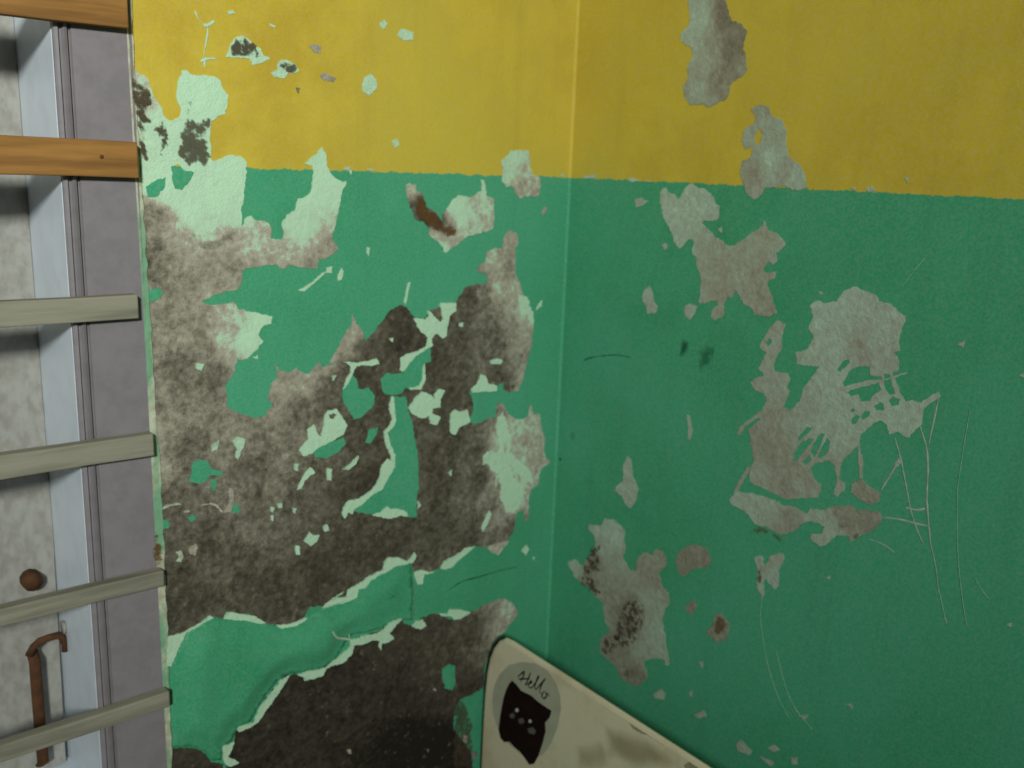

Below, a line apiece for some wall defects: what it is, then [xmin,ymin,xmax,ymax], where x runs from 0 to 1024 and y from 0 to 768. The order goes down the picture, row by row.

spalling [226,36,299,78]
peeling [680,0,747,107]
peeling [740,105,807,199]
peeling [132,69,550,667]
peeling [635,184,941,547]
peeling [615,457,639,508]
peeling [171,599,518,768]
peeling [568,518,711,686]